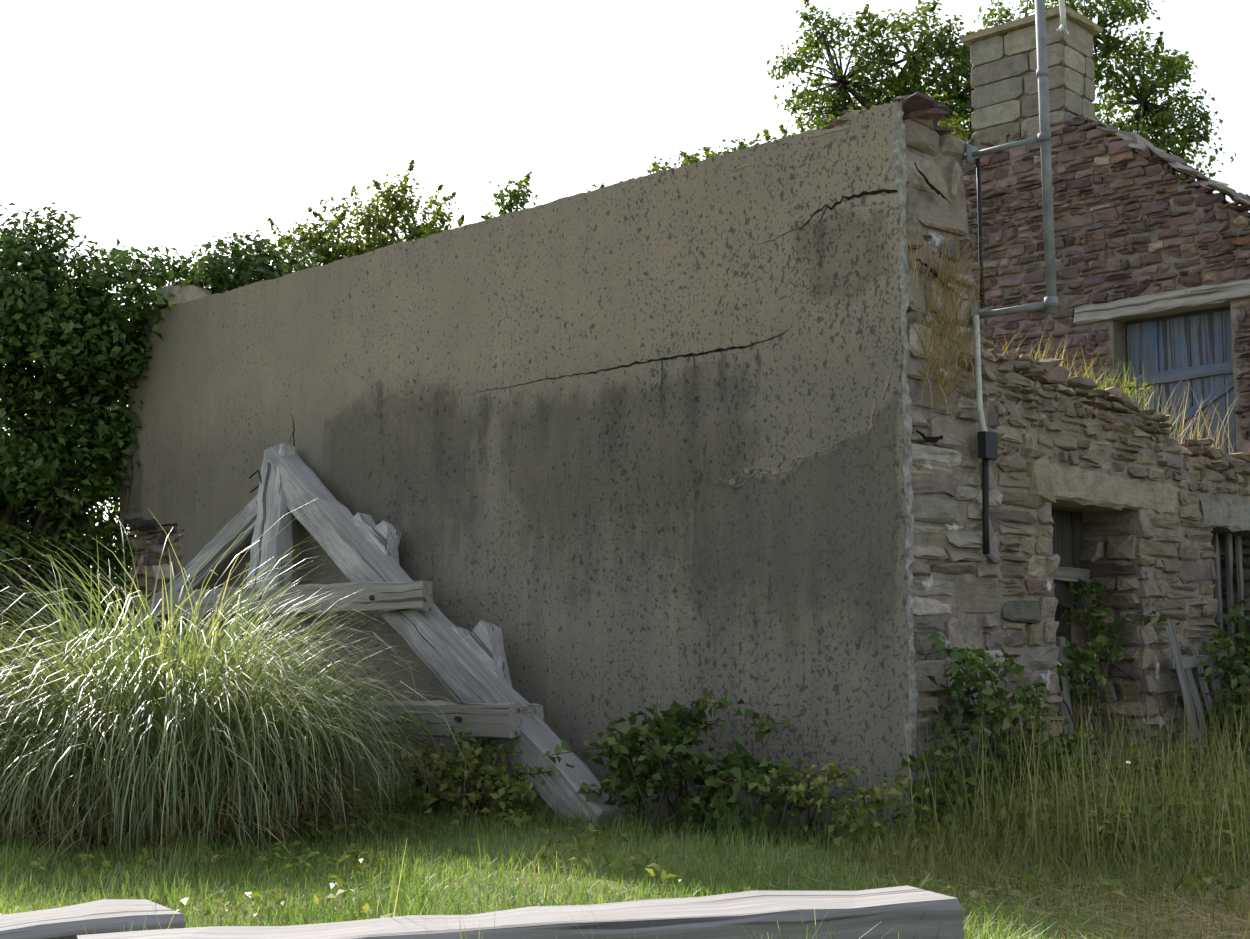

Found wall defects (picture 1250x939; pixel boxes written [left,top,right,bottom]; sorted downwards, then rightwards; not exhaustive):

crack [759,162,950,244]
crack [467,325,792,407]
leakage [324,387,488,541]
leakage [507,369,744,559]